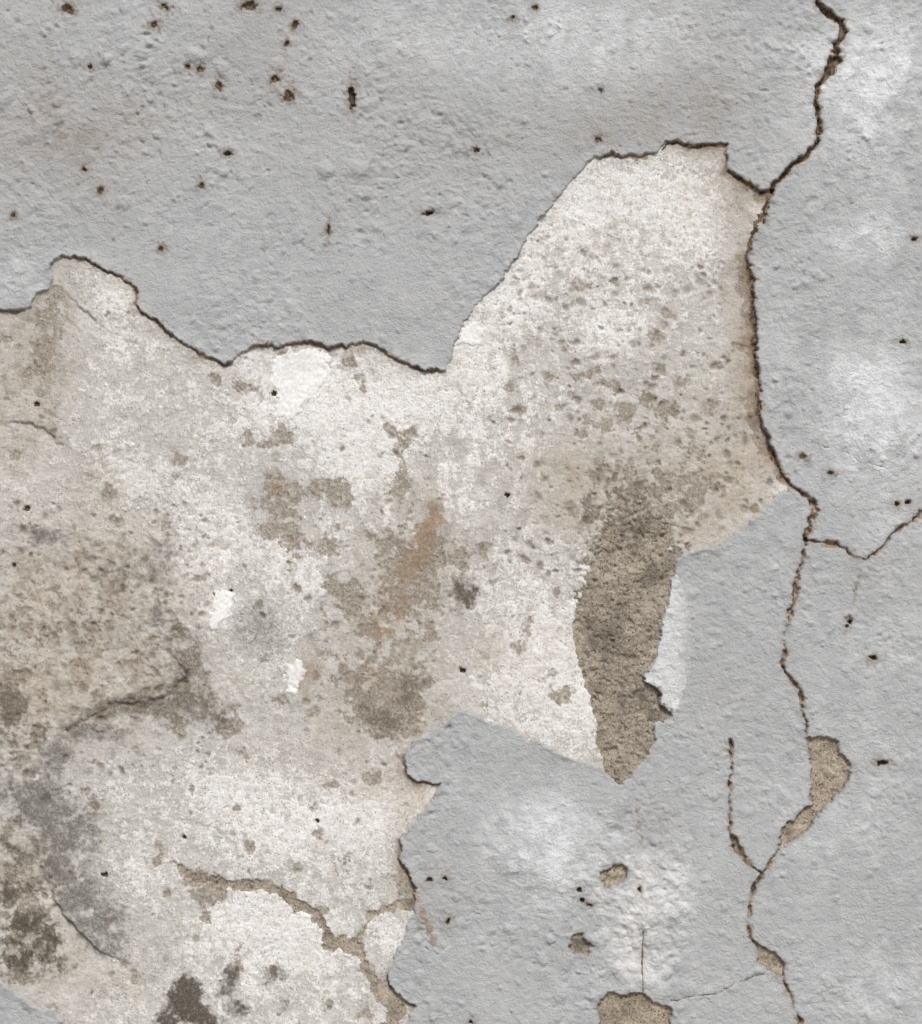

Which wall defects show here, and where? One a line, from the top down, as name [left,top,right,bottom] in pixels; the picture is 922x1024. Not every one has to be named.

crack [661,0,922,623]
peeling [0,142,789,1024]
crack [727,739,784,945]
crack [780,650,810,738]
spalling [779,736,850,843]
crack [671,973,803,1024]